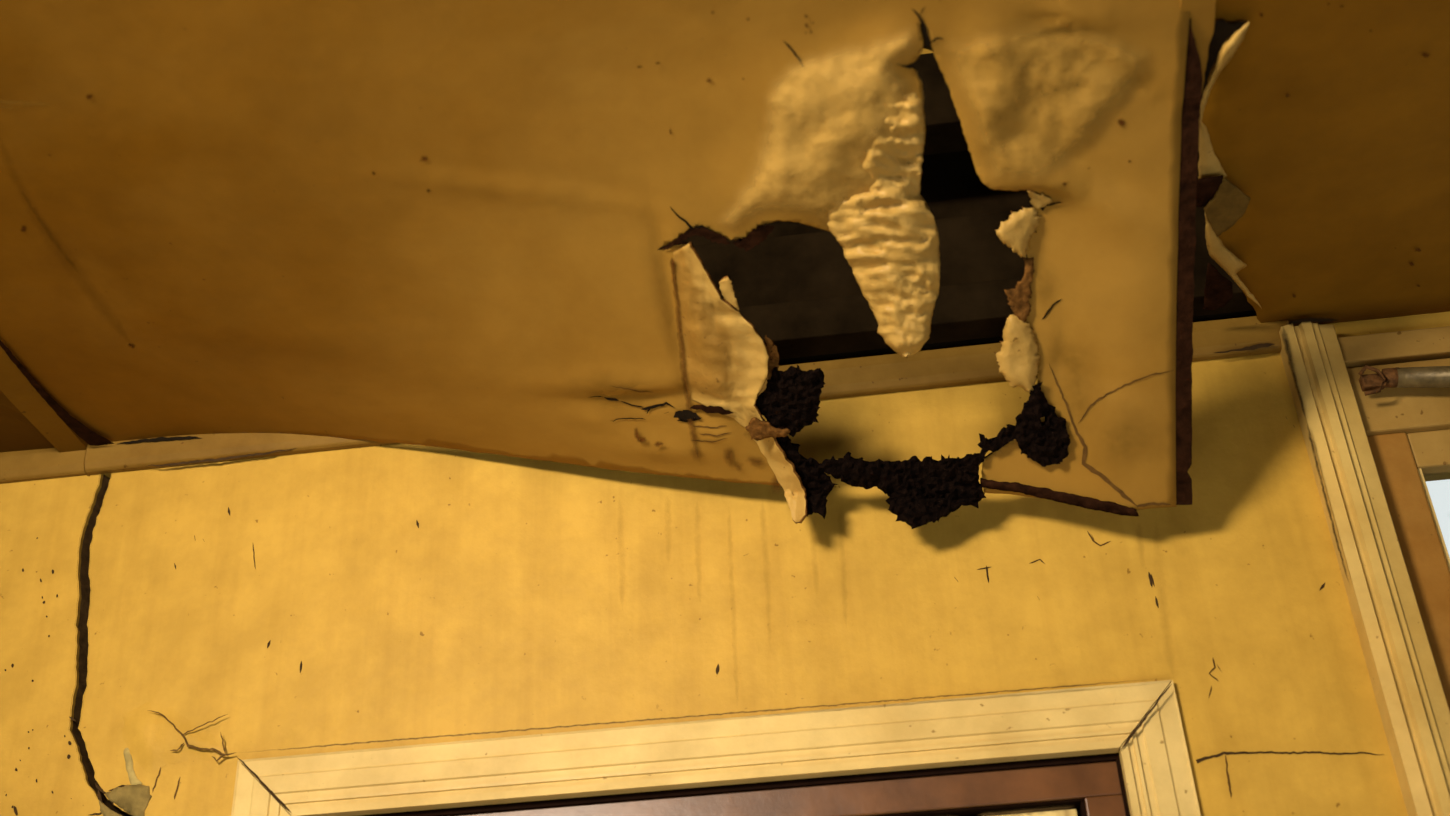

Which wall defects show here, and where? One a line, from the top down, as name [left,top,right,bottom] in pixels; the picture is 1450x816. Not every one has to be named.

peeling [673,242,807,524]
flaking render [99,748,152,816]
crack [68,475,291,816]
crack [1196,751,1384,796]